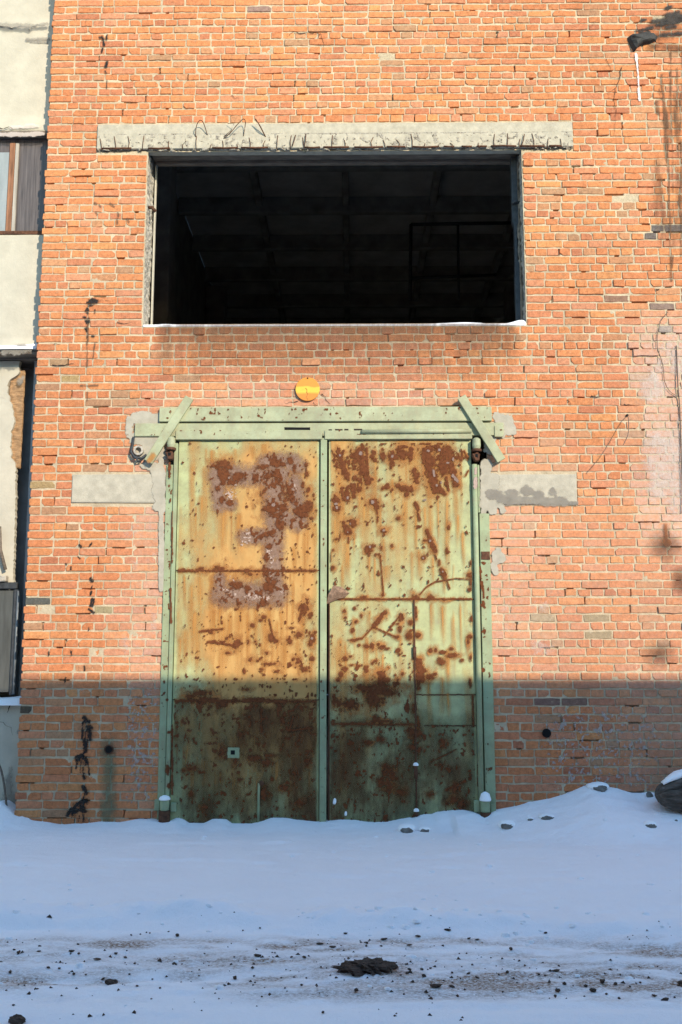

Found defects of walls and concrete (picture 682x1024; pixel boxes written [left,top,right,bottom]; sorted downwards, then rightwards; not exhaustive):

spalling [97,131,573,153]
water stain [656,52,682,244]
spalling [9,371,26,469]
corrosion [161,407,492,823]